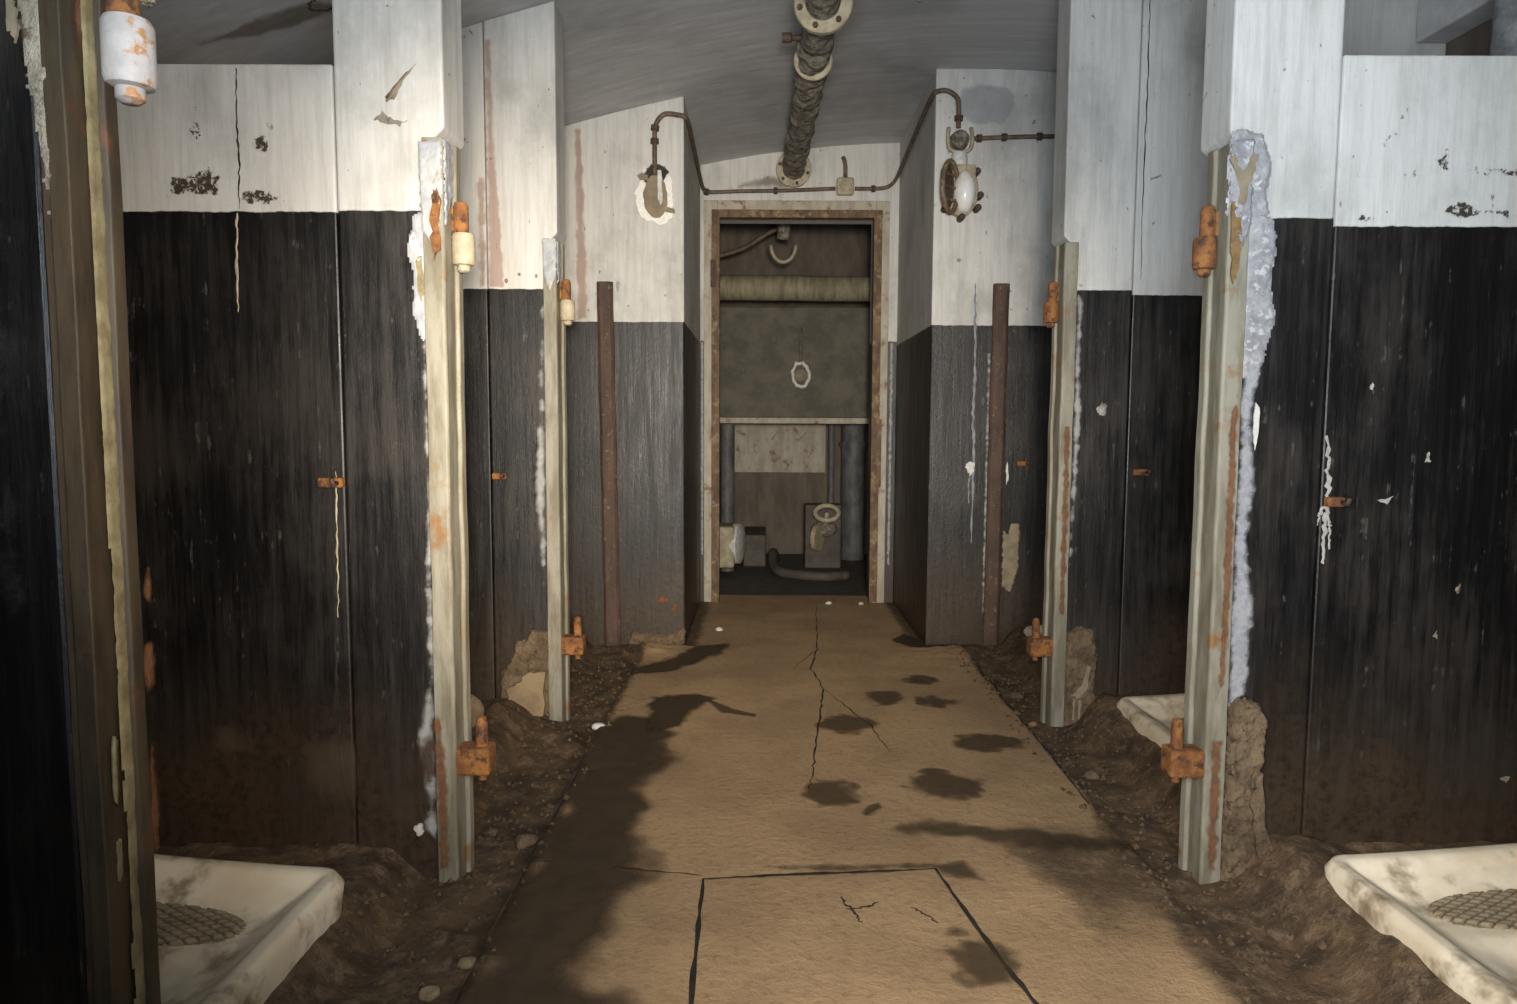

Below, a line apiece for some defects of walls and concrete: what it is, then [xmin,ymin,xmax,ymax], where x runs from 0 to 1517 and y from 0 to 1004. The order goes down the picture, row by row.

peeling [5,0,51,215]
crack [234,68,242,312]
peeling [374,111,408,127]
peeling [407,139,454,341]
peeling [80,0,146,1004]
peeling [1220,127,1277,881]
spalling [499,630,550,718]
crack [795,606,890,784]